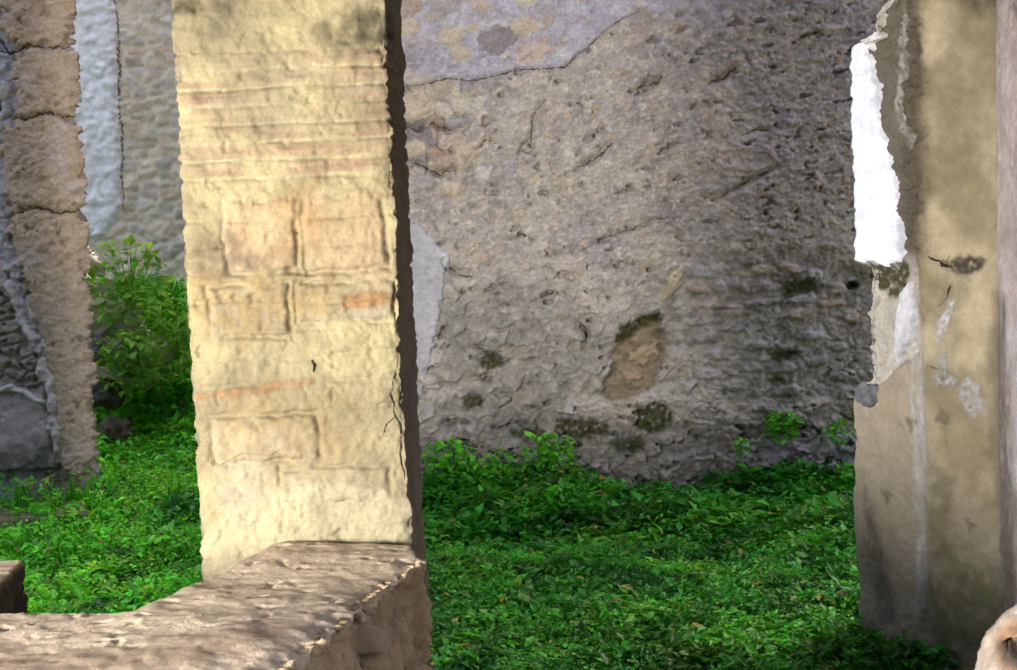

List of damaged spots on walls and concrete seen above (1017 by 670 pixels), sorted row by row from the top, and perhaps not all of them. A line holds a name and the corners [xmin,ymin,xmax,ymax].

crack [0,40,71,55]
crack [408,12,637,87]
crack [405,163,455,176]
crack [408,122,463,132]
crack [475,99,546,157]
crack [577,143,612,167]
peeling [849,31,907,267]
crack [584,214,674,250]
peeling [0,201,61,454]
spalling [602,320,695,399]
crack [383,372,404,472]